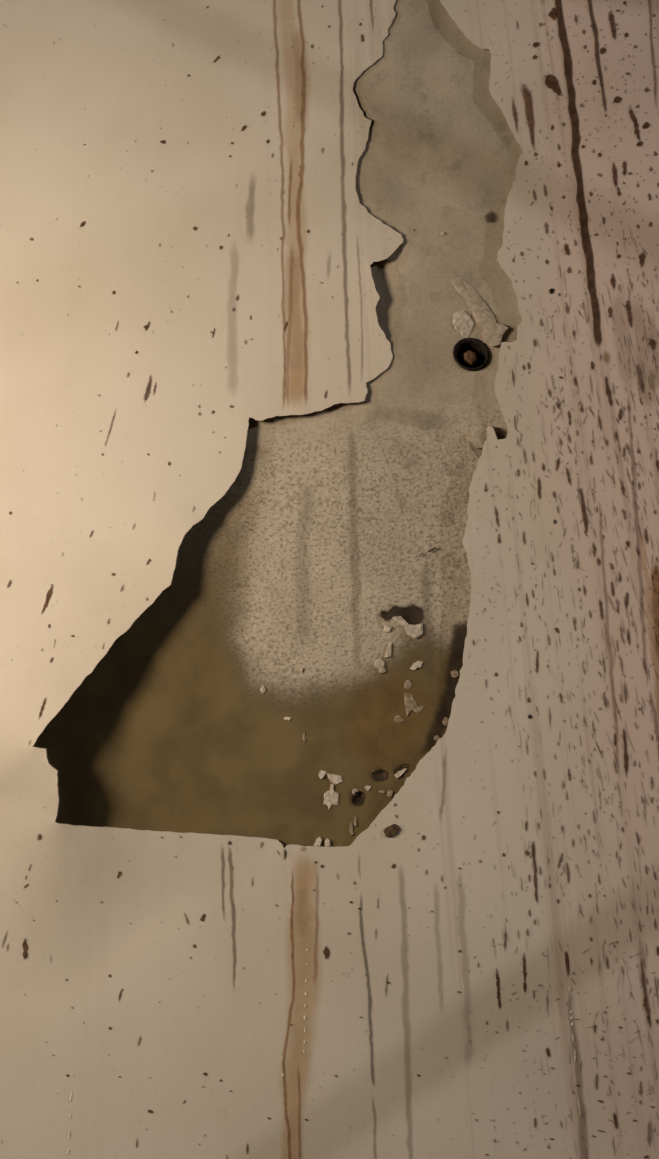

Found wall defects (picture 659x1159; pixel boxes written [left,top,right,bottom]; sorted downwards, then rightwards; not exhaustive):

rust [297,0,307,396]
leakage [512,87,537,165]
leakage [539,0,659,345]
peeling [33,0,522,849]
leakage [514,390,628,619]
leakage [598,377,640,457]
leakage [35,543,460,982]
rust [282,877,295,1159]